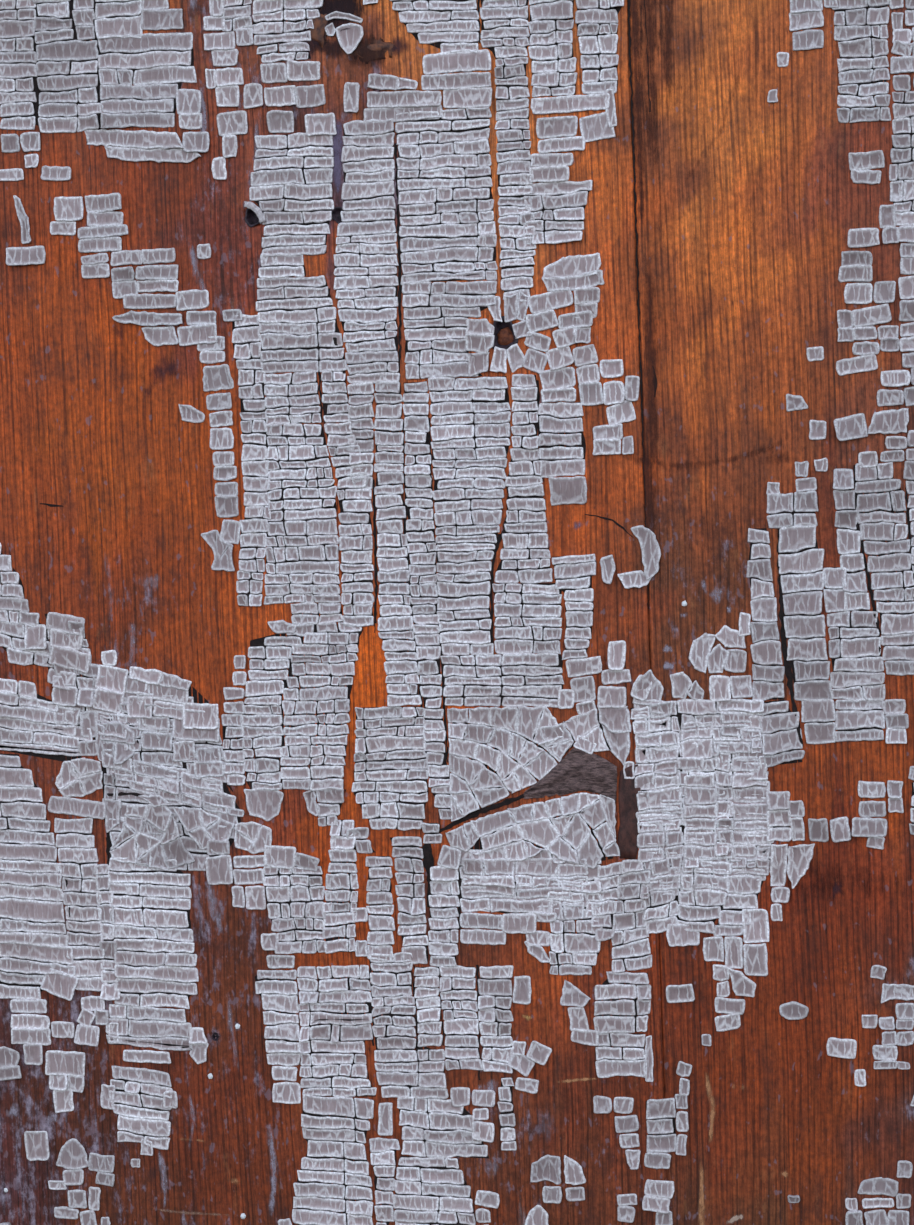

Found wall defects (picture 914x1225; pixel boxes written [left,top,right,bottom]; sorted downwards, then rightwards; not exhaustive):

peeling [777,52,789,67]
peeling [767,89,778,103]
peeling [0,0,640,1066]
peeling [766,408,914,744]
peeling [255,374,815,1225]
peeling [808,780,904,850]
peeling [826,965,914,1087]
peeling [0,1046,22,1081]
peeling [45,1050,85,1113]
peeling [100,1066,178,1168]
peeling [845,1160,913,1225]